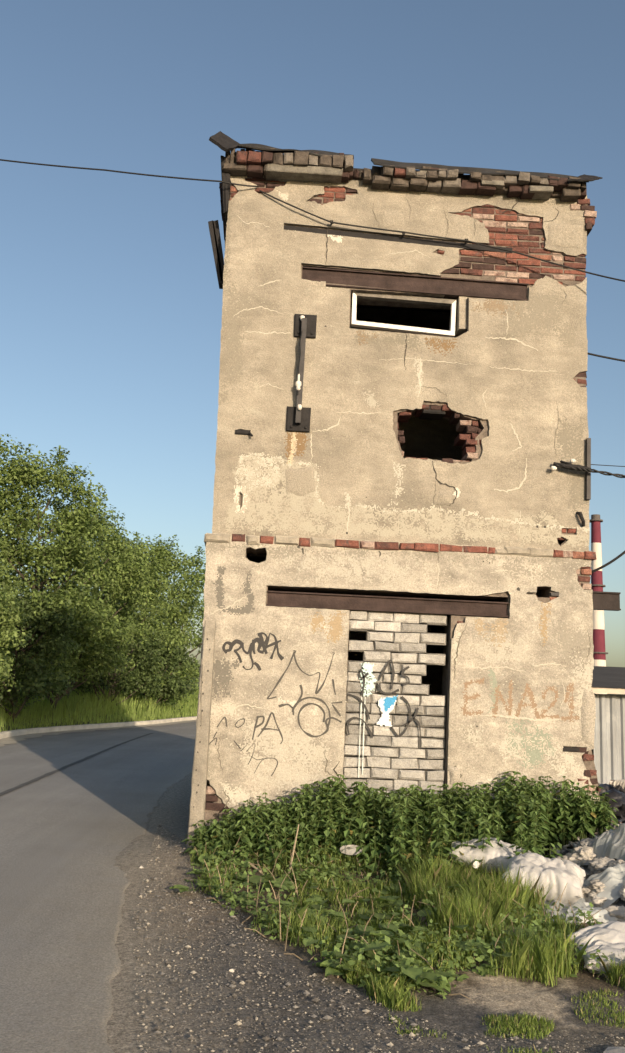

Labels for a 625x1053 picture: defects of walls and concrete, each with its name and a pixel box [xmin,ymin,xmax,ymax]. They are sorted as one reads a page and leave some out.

spalling [309,187,357,205]
spalling [442,204,586,285]
spalling [570,199,597,236]
spalling [574,372,587,387]
corrosion [284,431,310,463]
spalling [397,405,483,463]
crack [432,461,457,506]
crack [494,424,527,532]
peeling [218,452,590,586]
spalling [576,567,592,590]
peeling [544,655,601,794]
peeling [193,703,329,821]